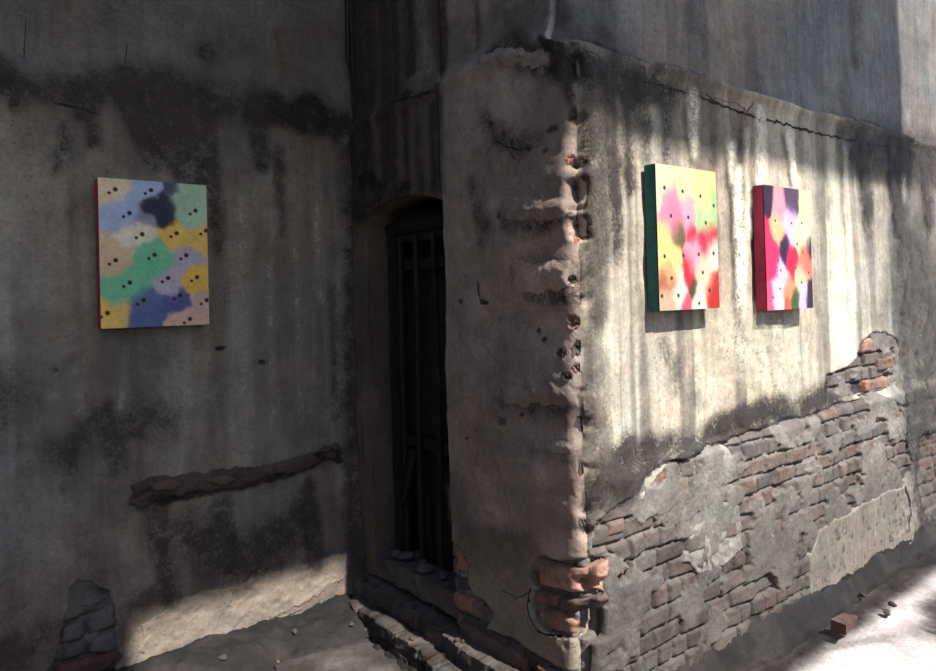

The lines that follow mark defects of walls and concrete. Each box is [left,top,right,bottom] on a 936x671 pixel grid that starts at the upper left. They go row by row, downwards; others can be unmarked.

damp [38,0,445,572]
damp [574,48,701,322]
damp [587,105,859,506]
crack [581,51,933,157]
damp [828,118,936,532]
flaking render [47,579,122,671]
flaking render [374,543,566,671]
flaking render [532,332,936,671]